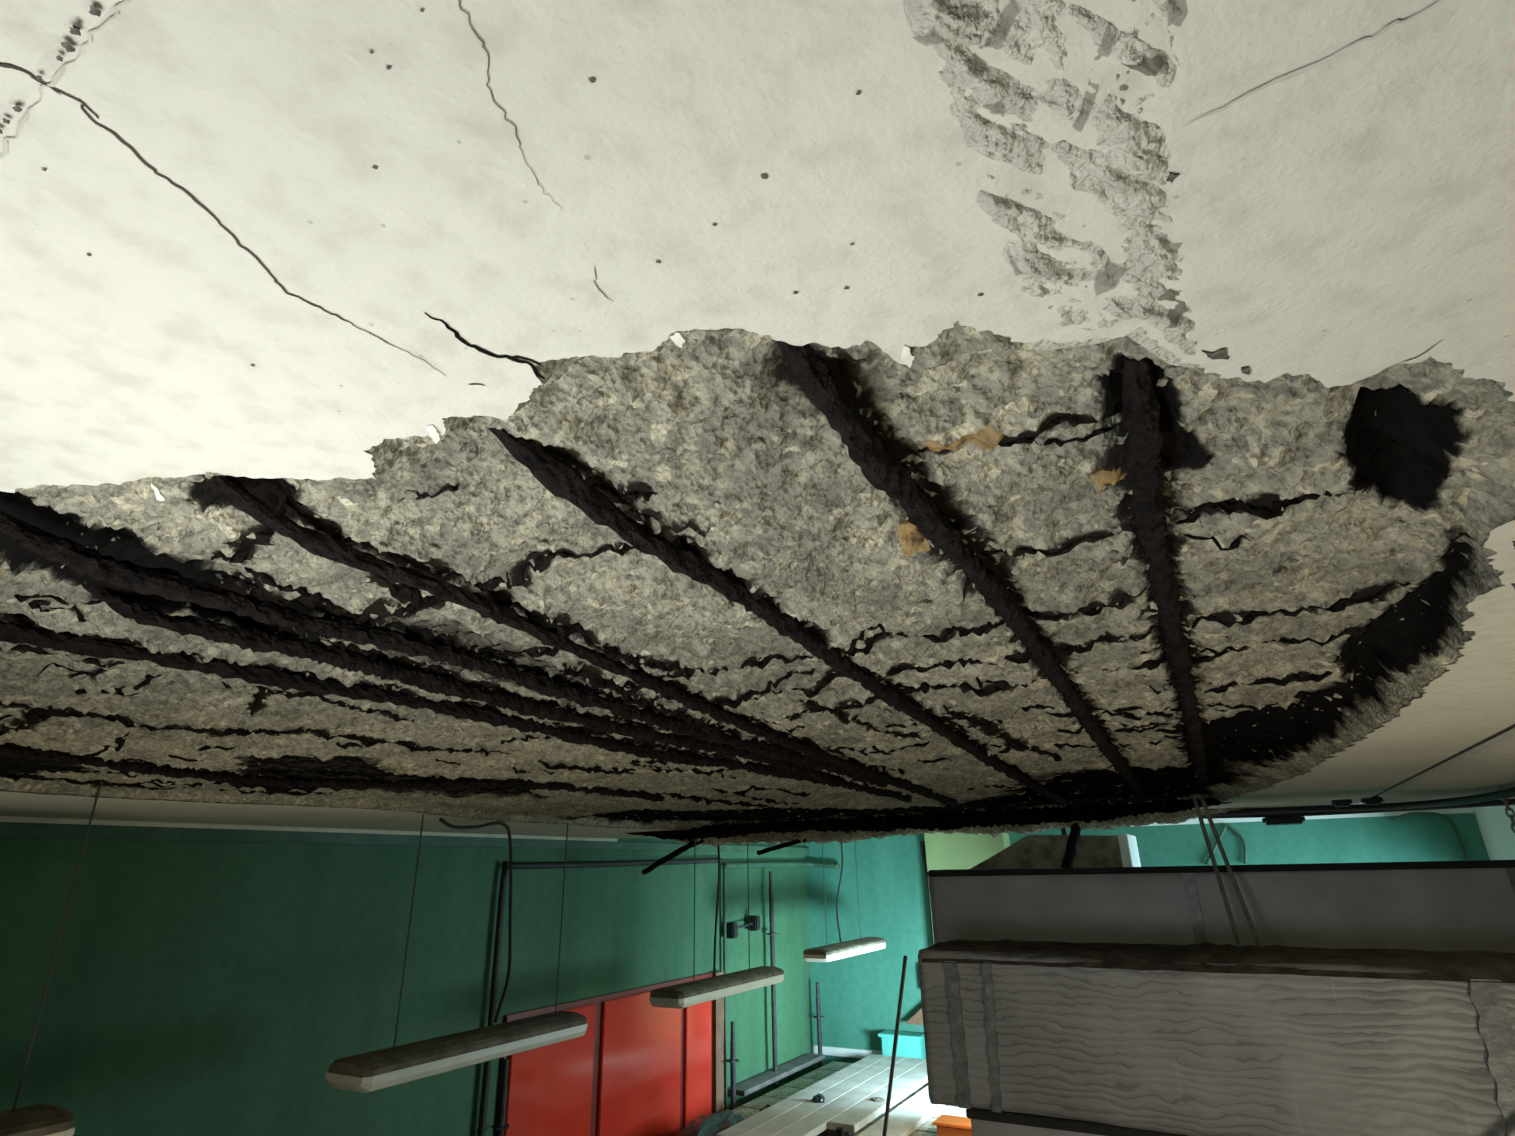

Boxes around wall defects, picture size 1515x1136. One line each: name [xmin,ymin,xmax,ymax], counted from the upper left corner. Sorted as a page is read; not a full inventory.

crack [0,64,546,386]
crack [458,0,562,210]
spalling [1117,56,1165,104]
spalling [0,289,1515,875]